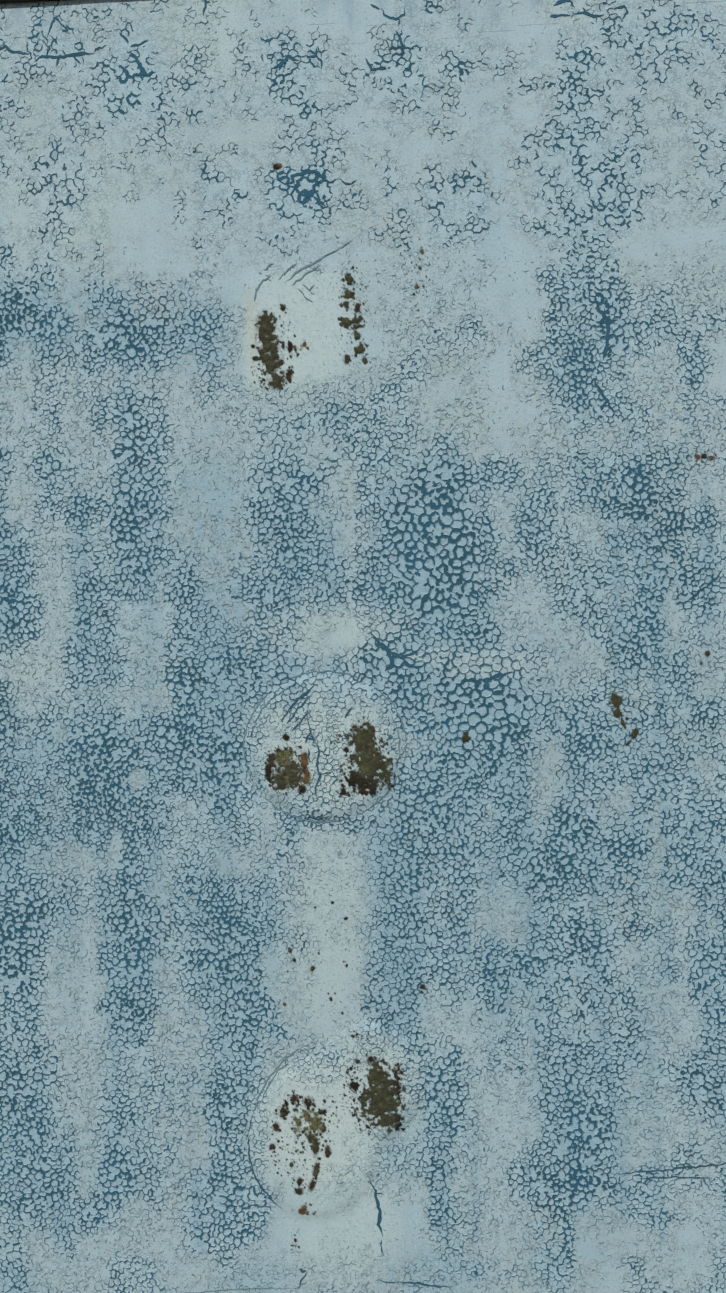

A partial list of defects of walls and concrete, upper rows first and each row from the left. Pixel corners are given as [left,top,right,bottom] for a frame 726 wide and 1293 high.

crack [150,0,179,14]
crack [0,155,11,183]
crack [172,142,251,265]
crack [215,86,258,121]
crack [226,0,524,259]
crack [355,159,505,295]
crack [687,79,726,111]
rust [251,304,309,390]
rust [338,266,369,364]
rust [264,734,310,795]
rust [330,716,396,802]
rust [269,1030,406,1215]